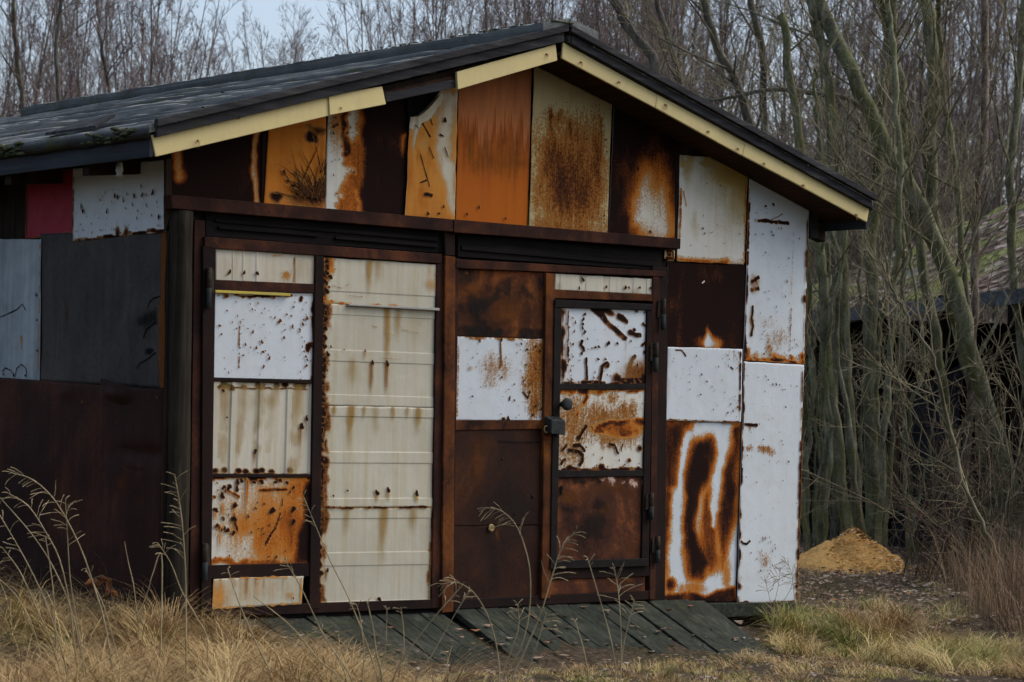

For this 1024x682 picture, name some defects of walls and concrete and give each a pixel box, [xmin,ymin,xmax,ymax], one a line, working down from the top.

rust [329,98,407,215]
rust [211,258,433,609]
rust [456,103,809,603]